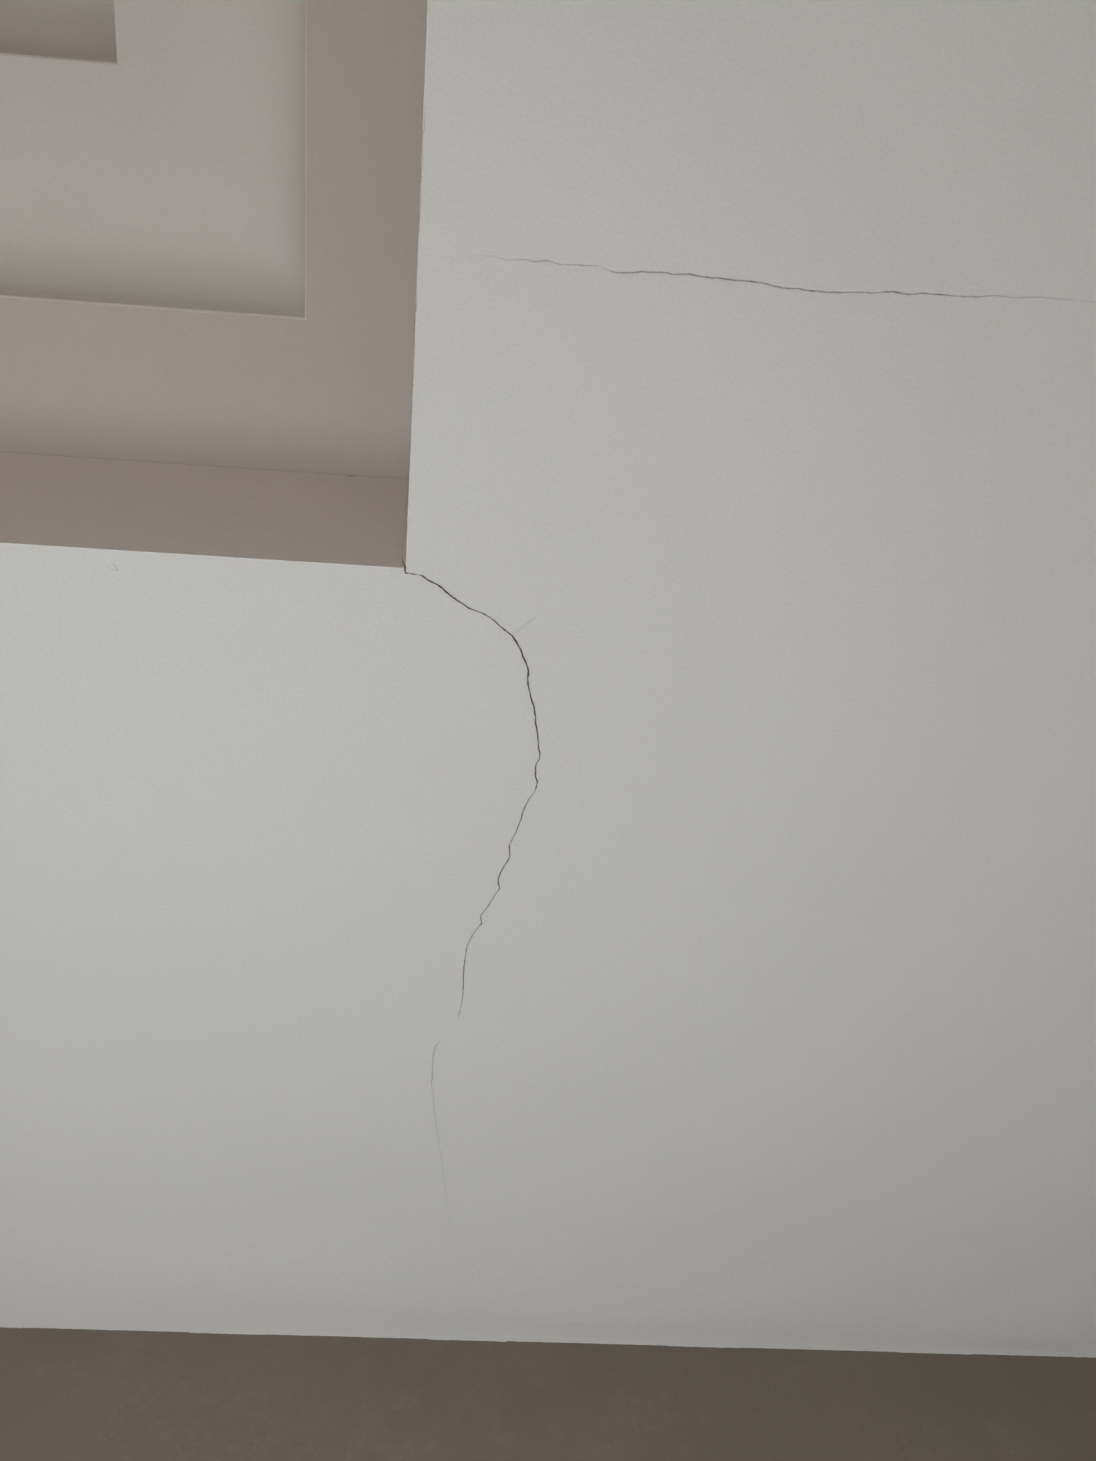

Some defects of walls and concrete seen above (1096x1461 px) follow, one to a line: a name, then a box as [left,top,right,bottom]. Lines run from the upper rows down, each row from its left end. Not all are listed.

crack [402,560,541,988]